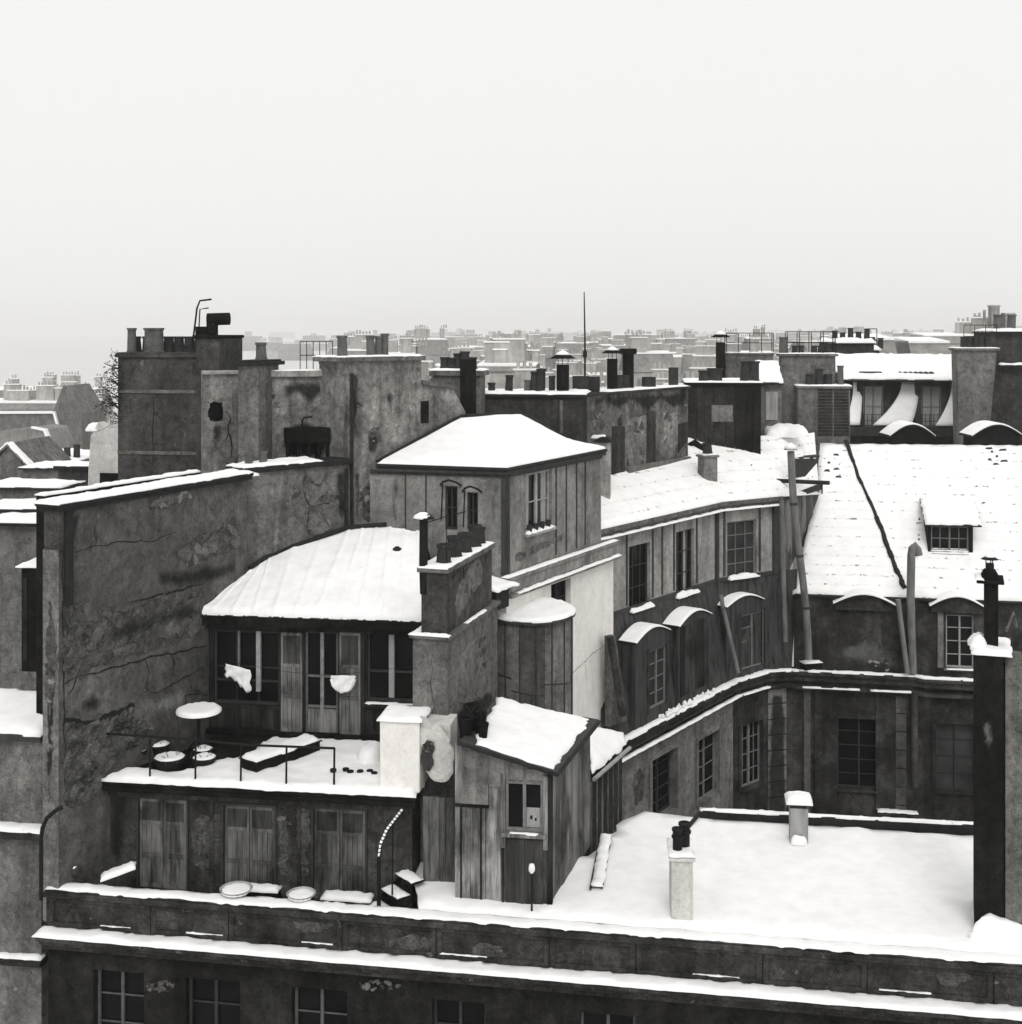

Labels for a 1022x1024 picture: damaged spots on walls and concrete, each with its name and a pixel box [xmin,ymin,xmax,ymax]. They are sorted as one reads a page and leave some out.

leakage [286,384,320,400]
crack [224,411,233,459]
crack [304,470,330,535]
crack [58,507,208,787]
peeling [146,978,180,993]
peeling [359,979,402,991]